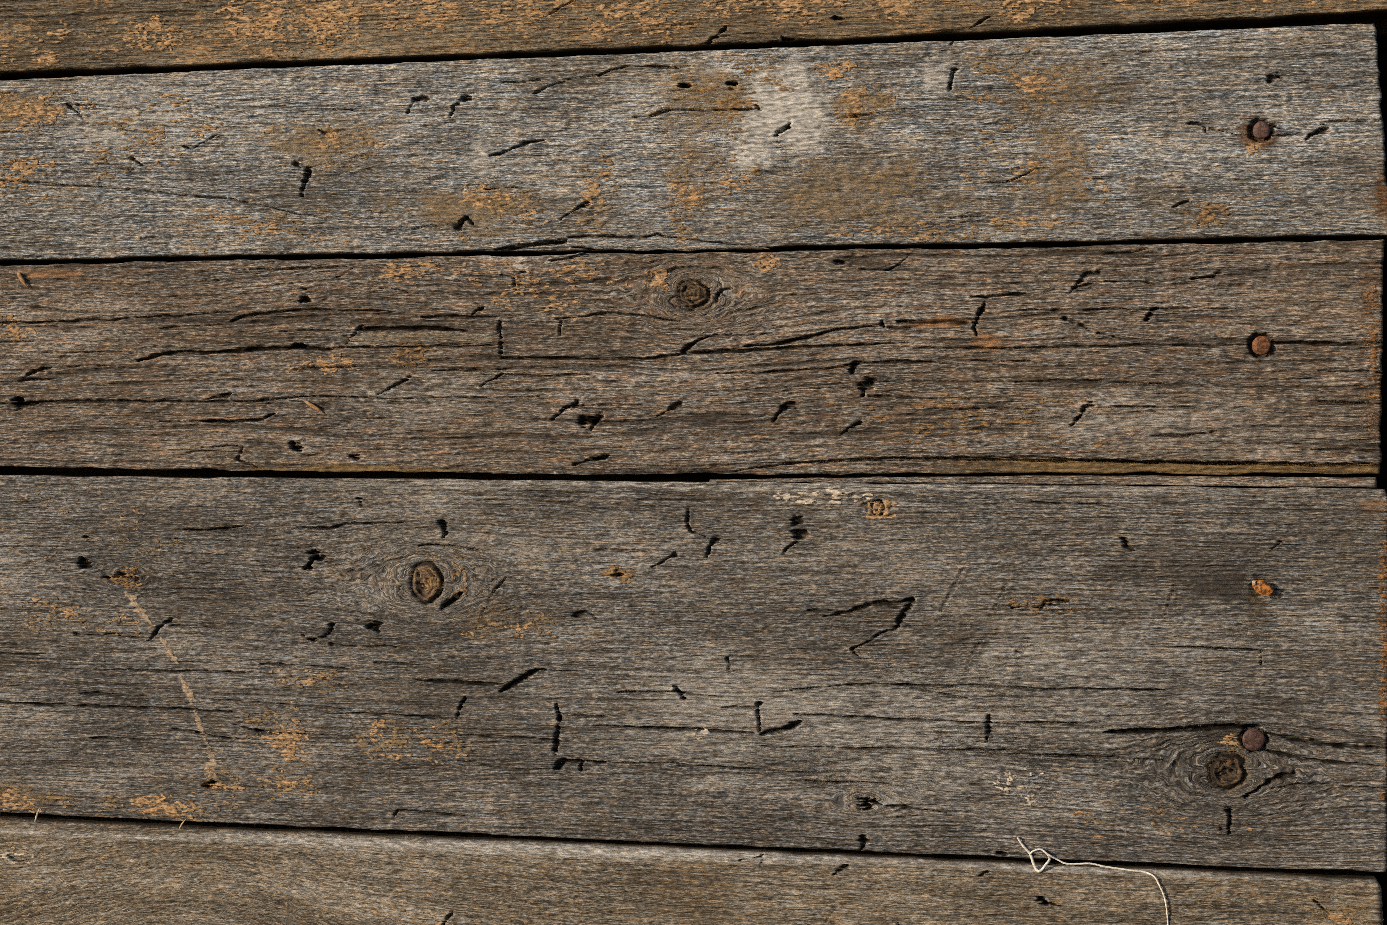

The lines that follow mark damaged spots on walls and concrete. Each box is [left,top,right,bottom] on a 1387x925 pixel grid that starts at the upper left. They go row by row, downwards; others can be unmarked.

corrosion [1238,124,1278,152]
crack [27,316,127,324]
crack [1145,307,1188,321]
crack [138,293,1022,381]
crack [1045,342,1122,350]
crack [1272,339,1382,347]